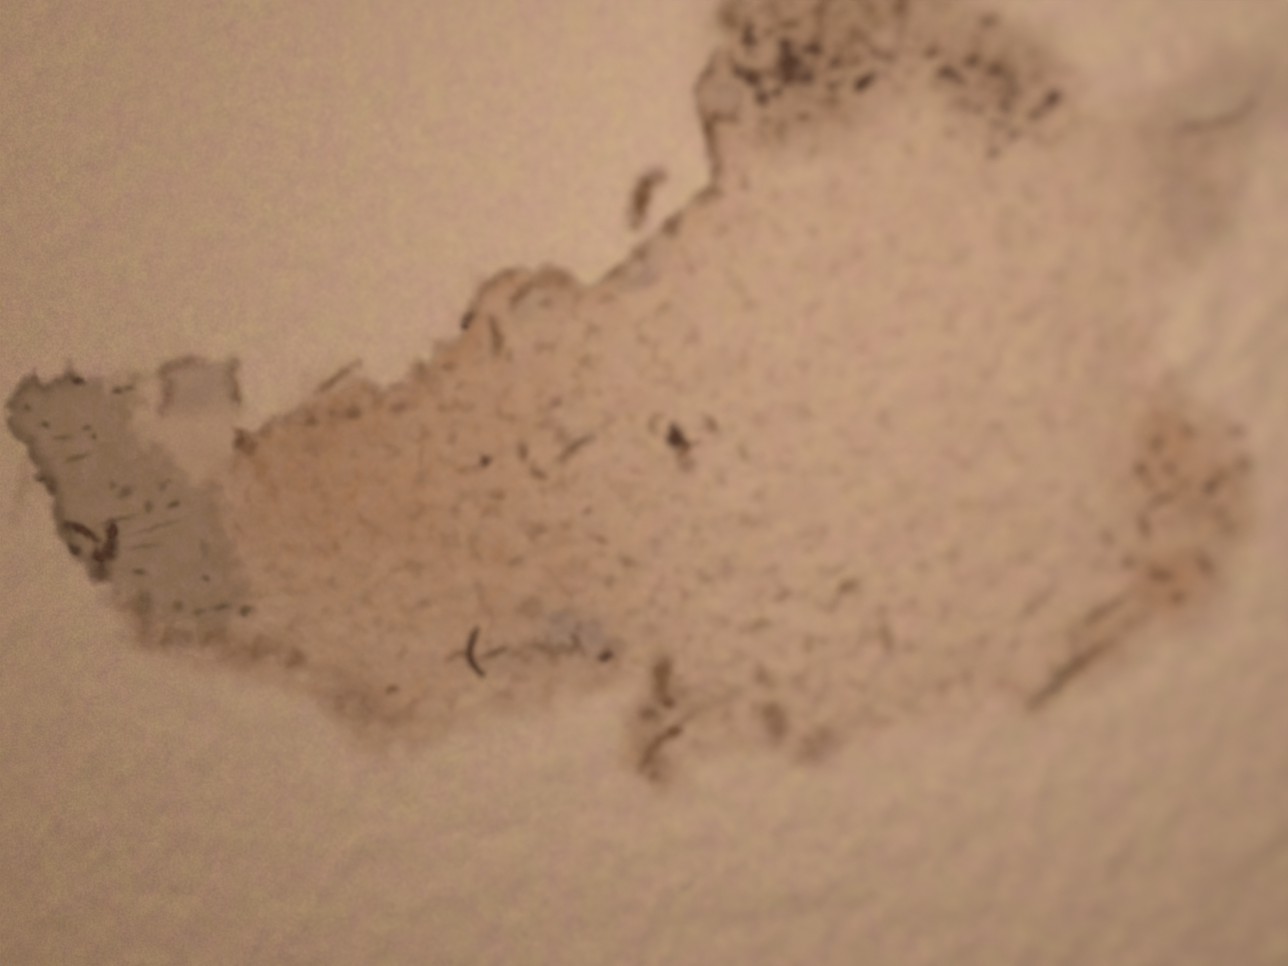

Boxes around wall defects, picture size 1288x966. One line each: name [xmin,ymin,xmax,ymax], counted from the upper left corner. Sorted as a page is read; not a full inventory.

water stain [734,24,834,103]
water stain [856,74,874,91]
peeling [634,178,653,226]
flaking render [9,373,245,624]